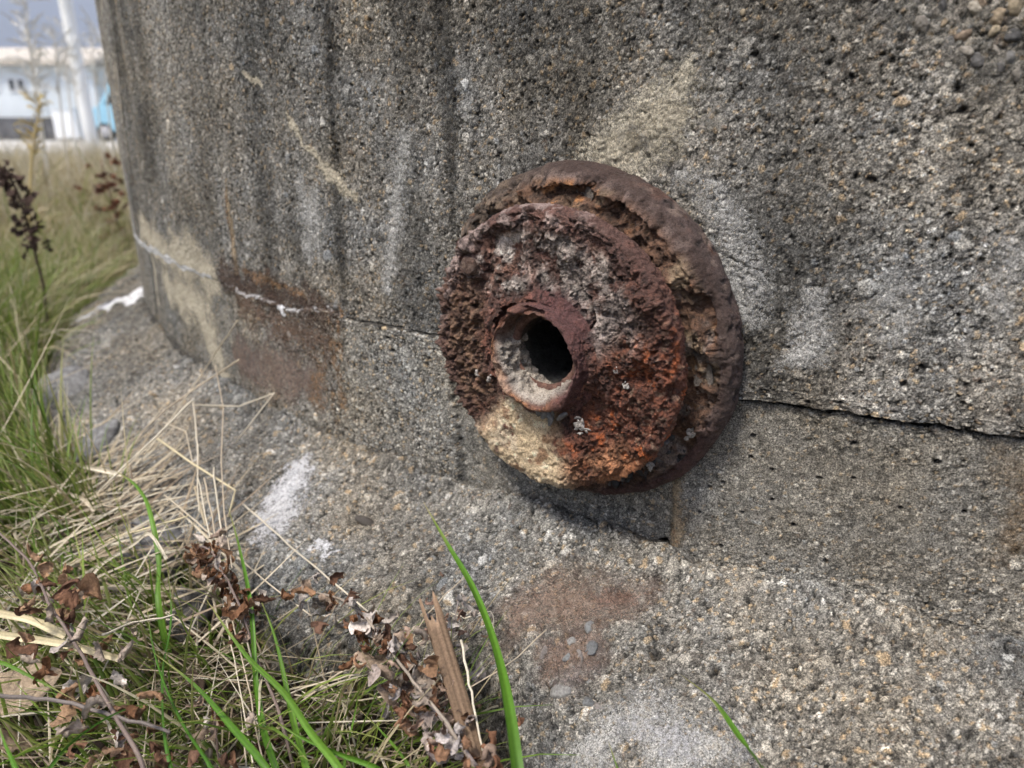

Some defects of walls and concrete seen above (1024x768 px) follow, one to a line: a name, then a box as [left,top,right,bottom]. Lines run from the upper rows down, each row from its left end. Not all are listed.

rust [217,178,348,426]
crack [739,400,1024,439]